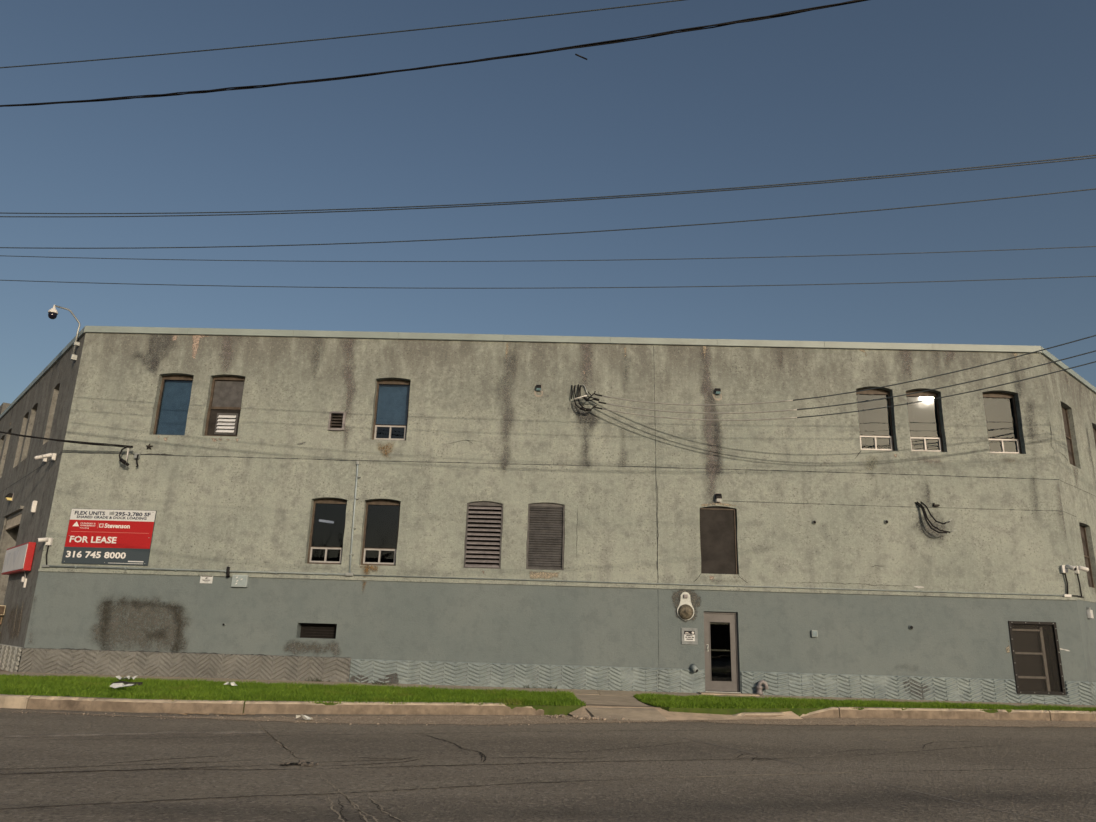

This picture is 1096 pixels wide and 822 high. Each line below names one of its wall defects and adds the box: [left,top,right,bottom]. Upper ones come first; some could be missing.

water stain [138,334,172,372]
water stain [499,358,515,466]
water stain [702,346,720,498]